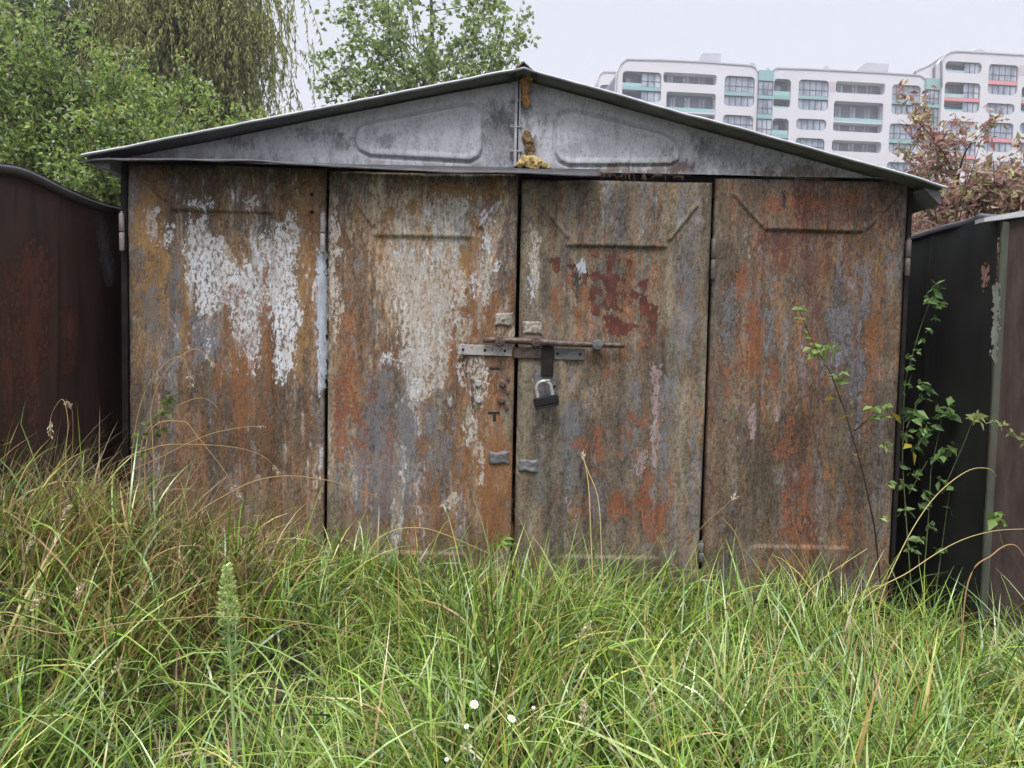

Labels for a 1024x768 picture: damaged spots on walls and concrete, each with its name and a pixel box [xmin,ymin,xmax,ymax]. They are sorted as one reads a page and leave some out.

corrosion [129,181,190,382]
peeling [142,194,305,387]
corrosion [220,194,313,391]
corrosion [330,364,396,488]
peeling [380,234,501,413]
corrosion [384,179,514,555]
corrosion [547,247,661,379]
corrosion [721,260,782,409]
corrosion [764,228,860,425]